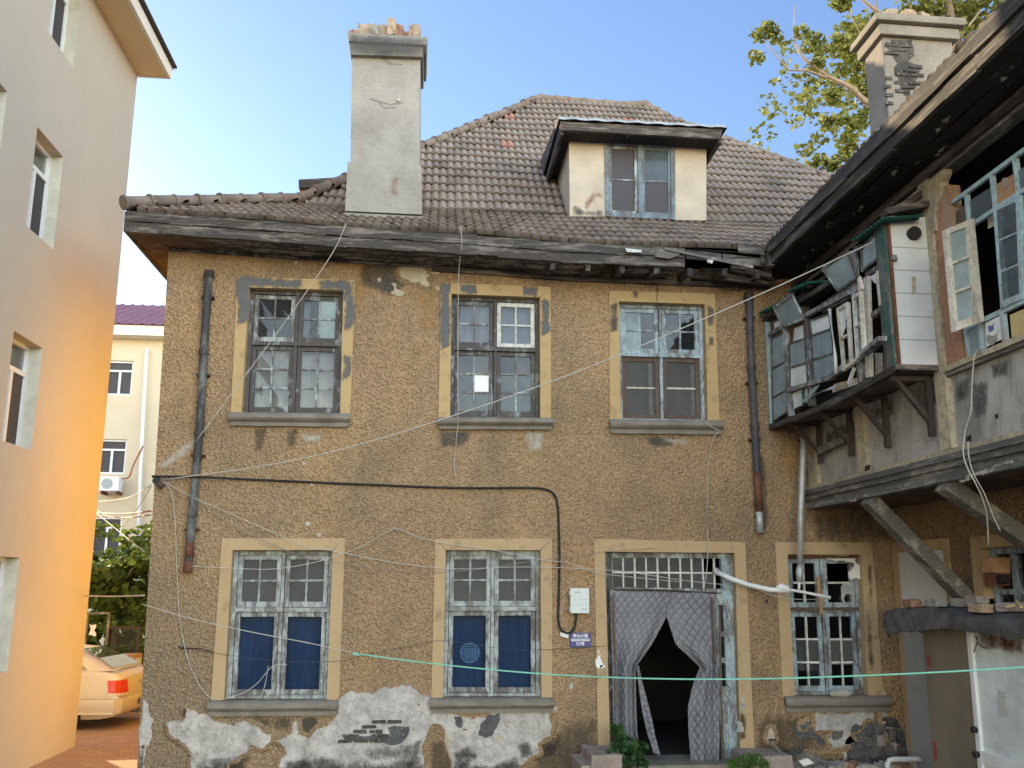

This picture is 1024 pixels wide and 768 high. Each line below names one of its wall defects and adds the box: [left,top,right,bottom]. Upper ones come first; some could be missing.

spalling [883,39,924,106]
peeling [377,266,440,296]
peeling [139,678,557,768]
peeling [762,722,780,746]
peeling [794,710,908,764]